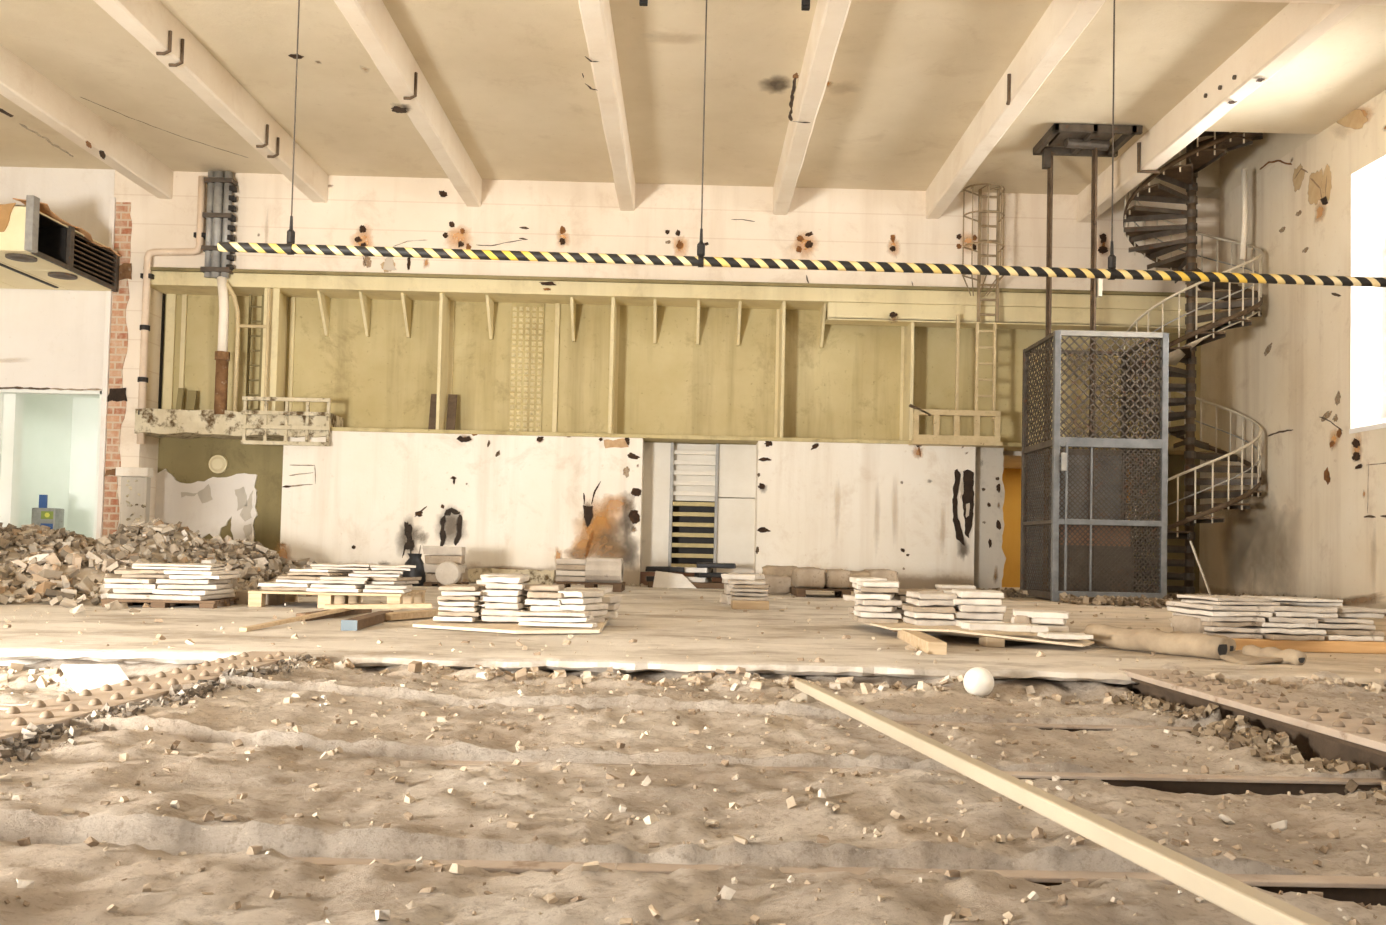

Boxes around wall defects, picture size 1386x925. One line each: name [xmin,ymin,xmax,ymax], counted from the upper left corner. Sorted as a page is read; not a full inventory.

peeling [1293,164,1332,218]
rust [355,225,372,268]
rust [443,221,471,249]
rust [796,232,813,253]
spalling [1321,391,1341,422]
peeling [155,469,258,542]
water stain [381,508,462,565]
rust [556,499,635,563]